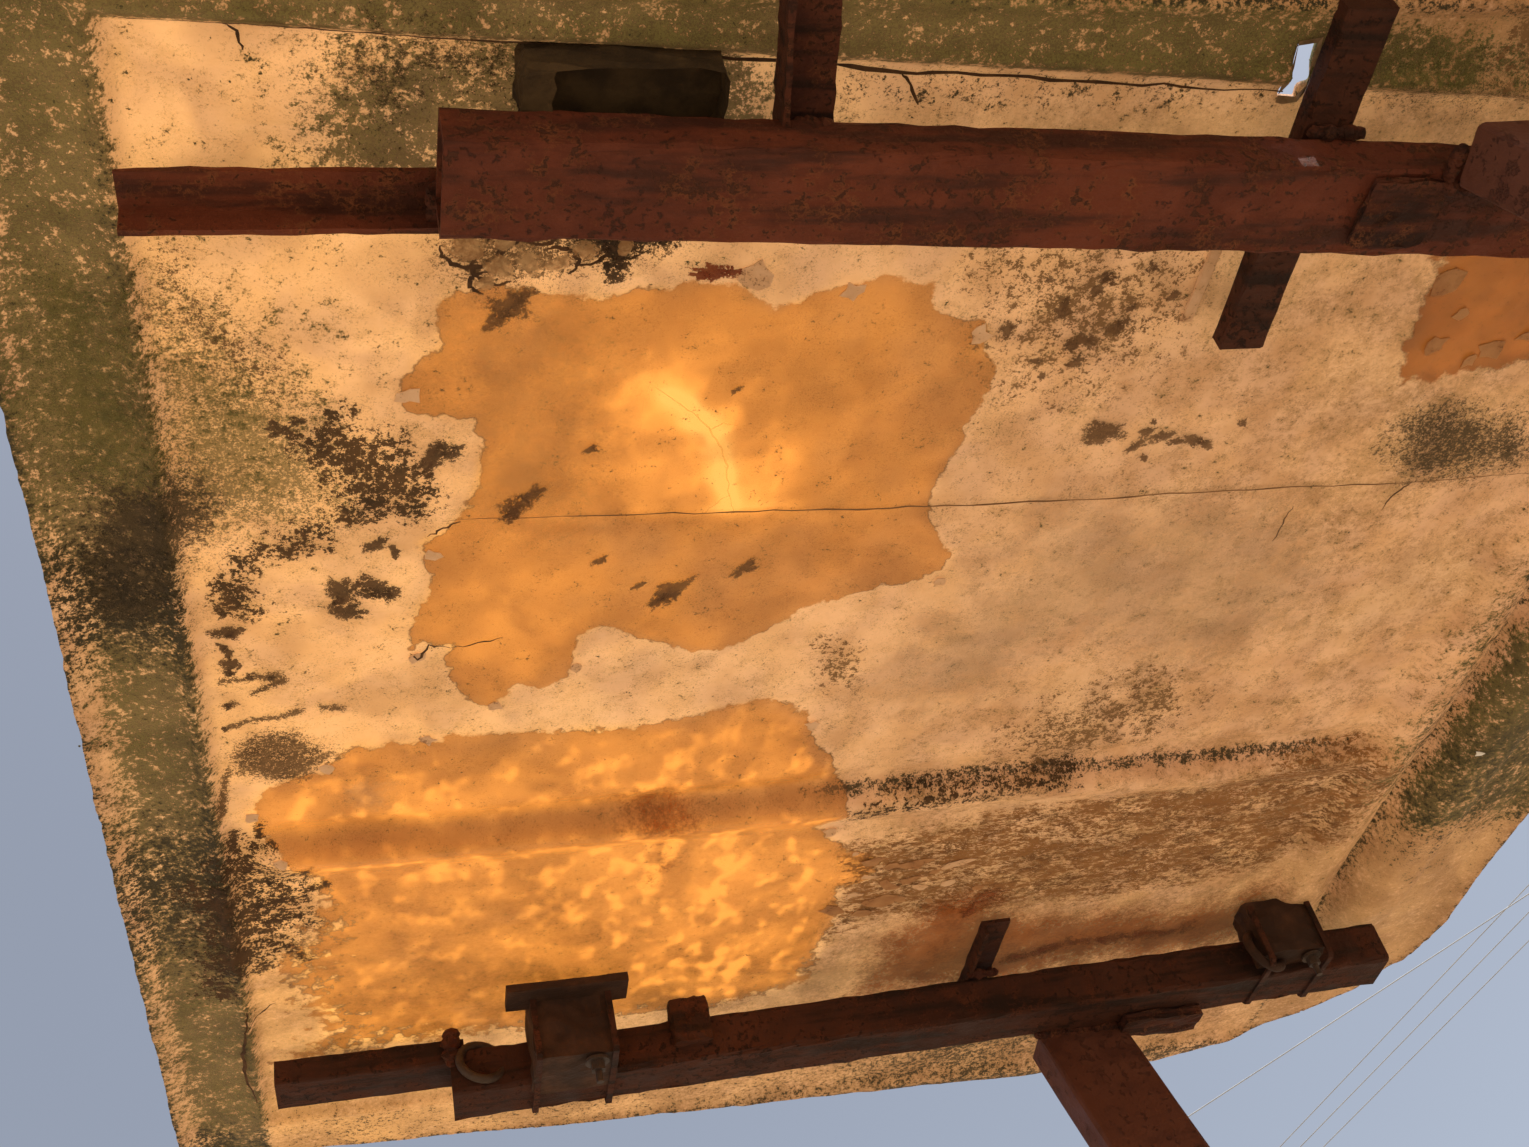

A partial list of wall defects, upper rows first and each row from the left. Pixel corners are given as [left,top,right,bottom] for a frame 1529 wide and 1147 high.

crack [114,16,585,50]
crack [722,55,776,63]
crack [837,63,1283,105]
peeling [737,259,774,291]
peeling [1398,255,1529,386]
peeling [394,285,553,711]
crack [427,473,1529,540]
water stain [1369,390,1529,490]
water stain [55,241,466,1005]
peeling [245,735,437,870]
water stain [840,654,1216,822]
peeling [273,875,430,1056]